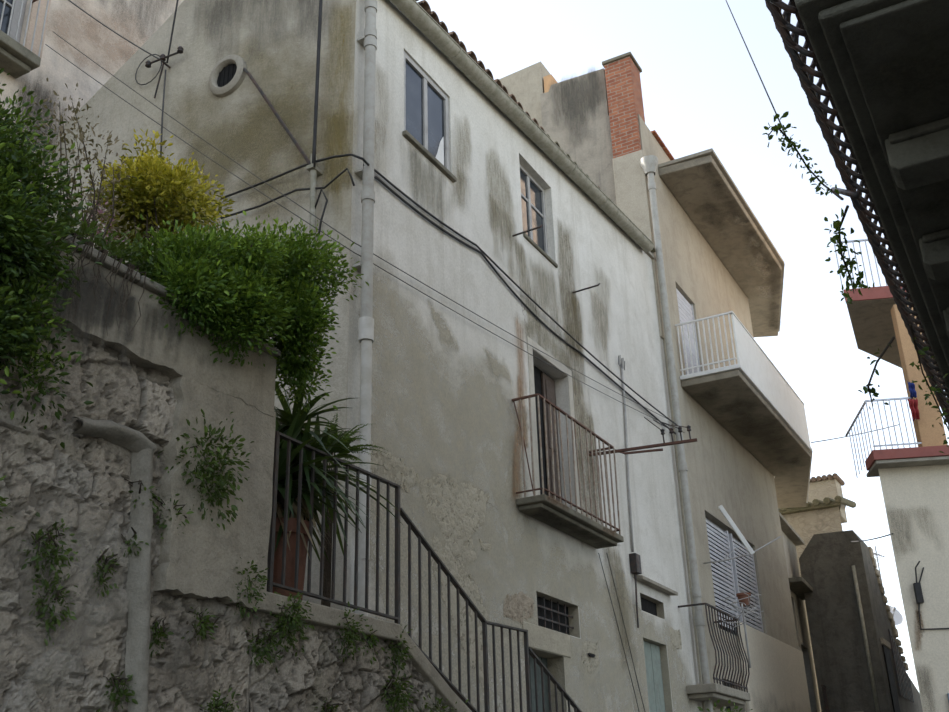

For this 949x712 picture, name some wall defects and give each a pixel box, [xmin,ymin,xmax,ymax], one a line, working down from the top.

peeling [369,275,690,712]
leakage [559,232,598,518]